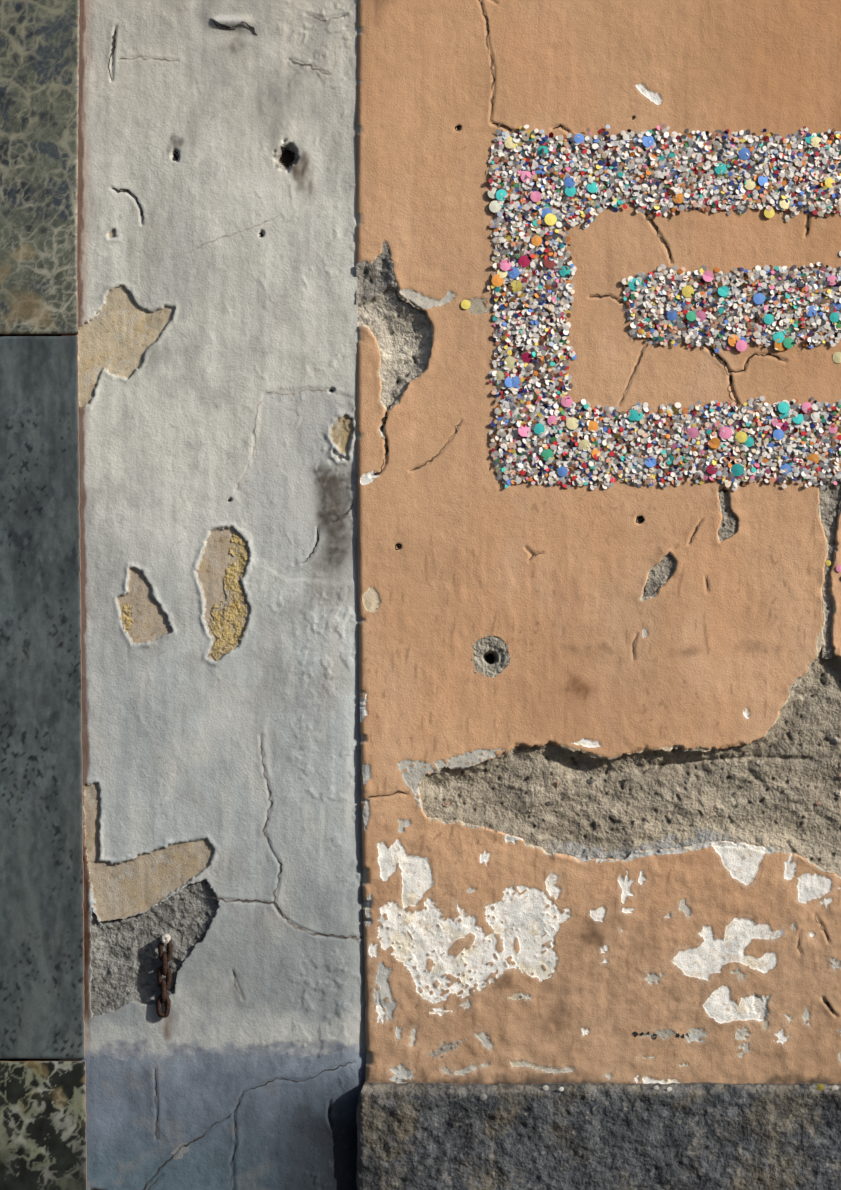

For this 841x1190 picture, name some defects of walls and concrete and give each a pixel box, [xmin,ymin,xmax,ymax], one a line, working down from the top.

crack [479,0,517,133]
crack [646,214,672,264]
flaking render [356,241,495,411]
crack [619,347,644,405]
crack [703,344,786,404]
peeling [196,527,250,661]
flaking render [397,473,841,914]
flaking render [83,783,219,1017]
crack [210,737,363,940]
peeling [363,819,571,1047]
peeling [632,918,815,1058]
crack [143,1062,354,1190]